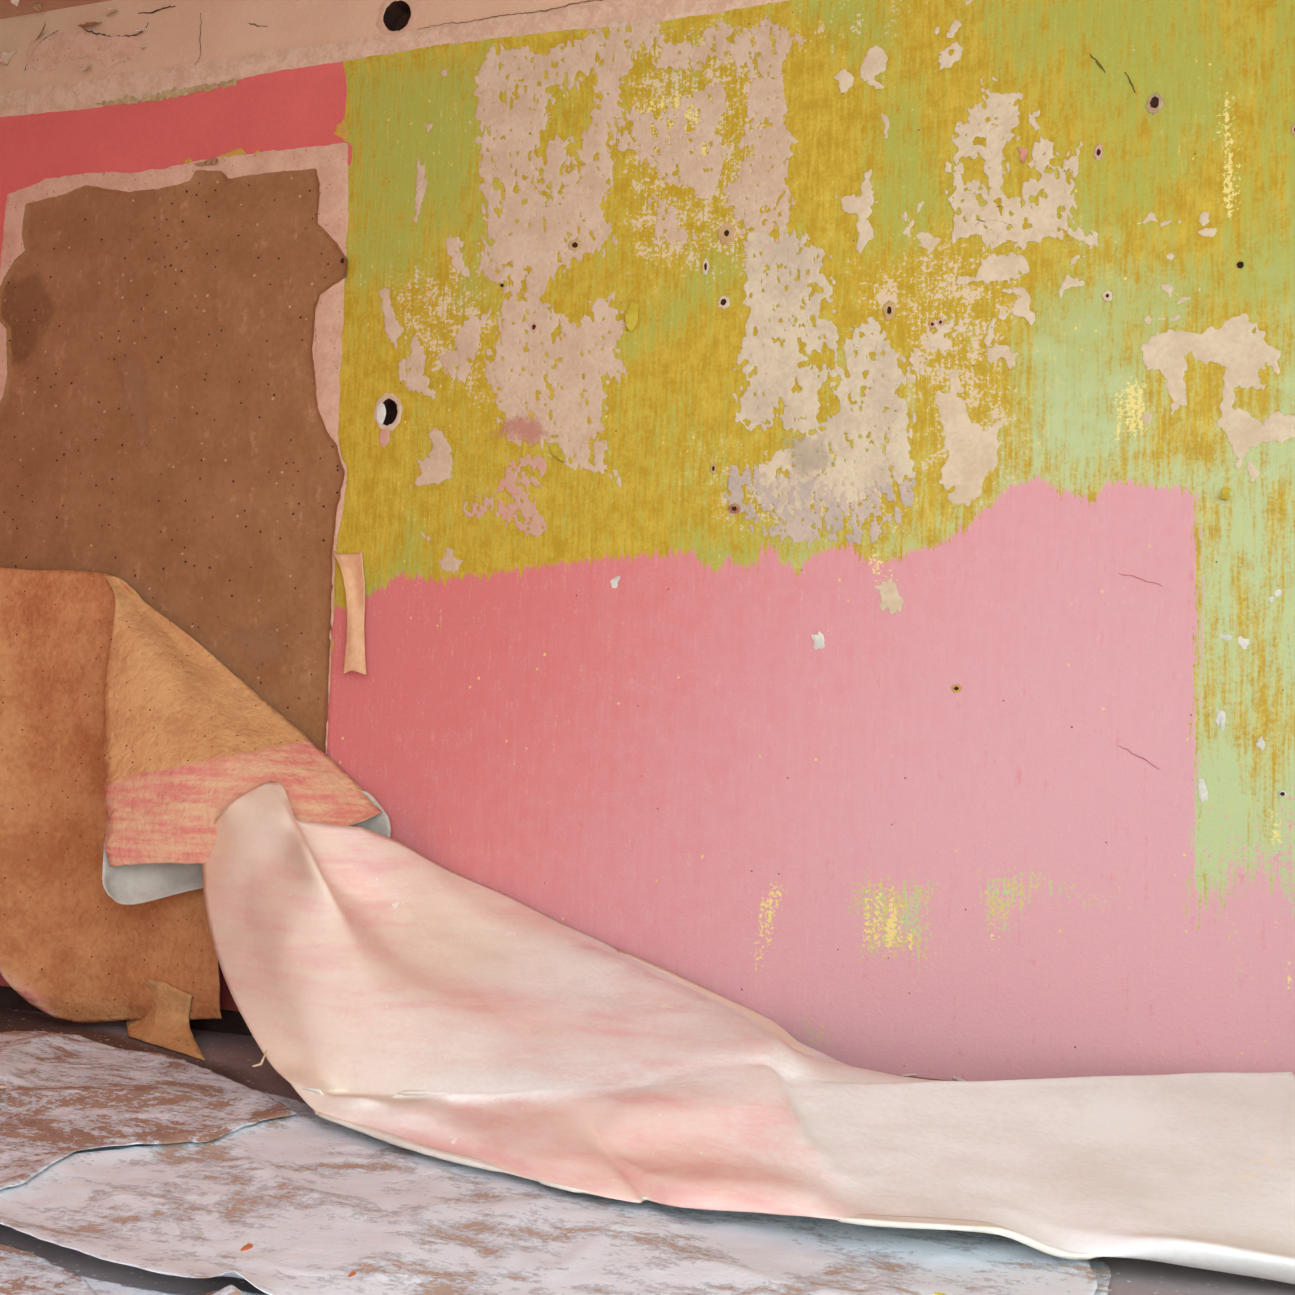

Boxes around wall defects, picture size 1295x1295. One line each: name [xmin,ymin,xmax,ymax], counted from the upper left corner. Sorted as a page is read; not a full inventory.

peeling [96,78,240,106]
flaking render [375,0,418,35]
peeling [374,11,1003,549]
peeling [891,77,1104,369]
flaking render [0,119,349,755]
peeling [1141,284,1295,482]
peeling [440,547,463,573]